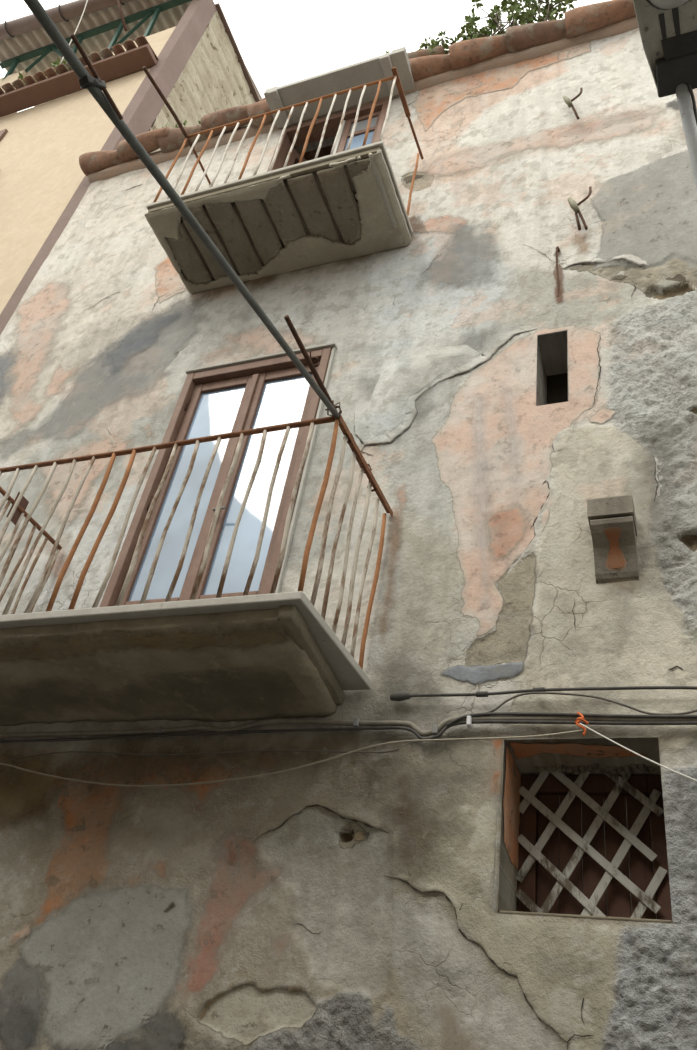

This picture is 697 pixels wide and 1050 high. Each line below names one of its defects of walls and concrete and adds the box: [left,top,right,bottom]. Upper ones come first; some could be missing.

peeling [155,257,187,303]
damp [430,226,495,286]
corrosion [554,246,563,303]
damp [0,274,275,457]
crack [354,320,537,456]
peeling [432,325,616,669]
spalling [680,535,697,552]
peeling [10,752,277,941]
crack [248,785,393,842]
flaking render [339,822,369,849]
crack [383,864,595,1050]
flaking render [198,984,317,1045]